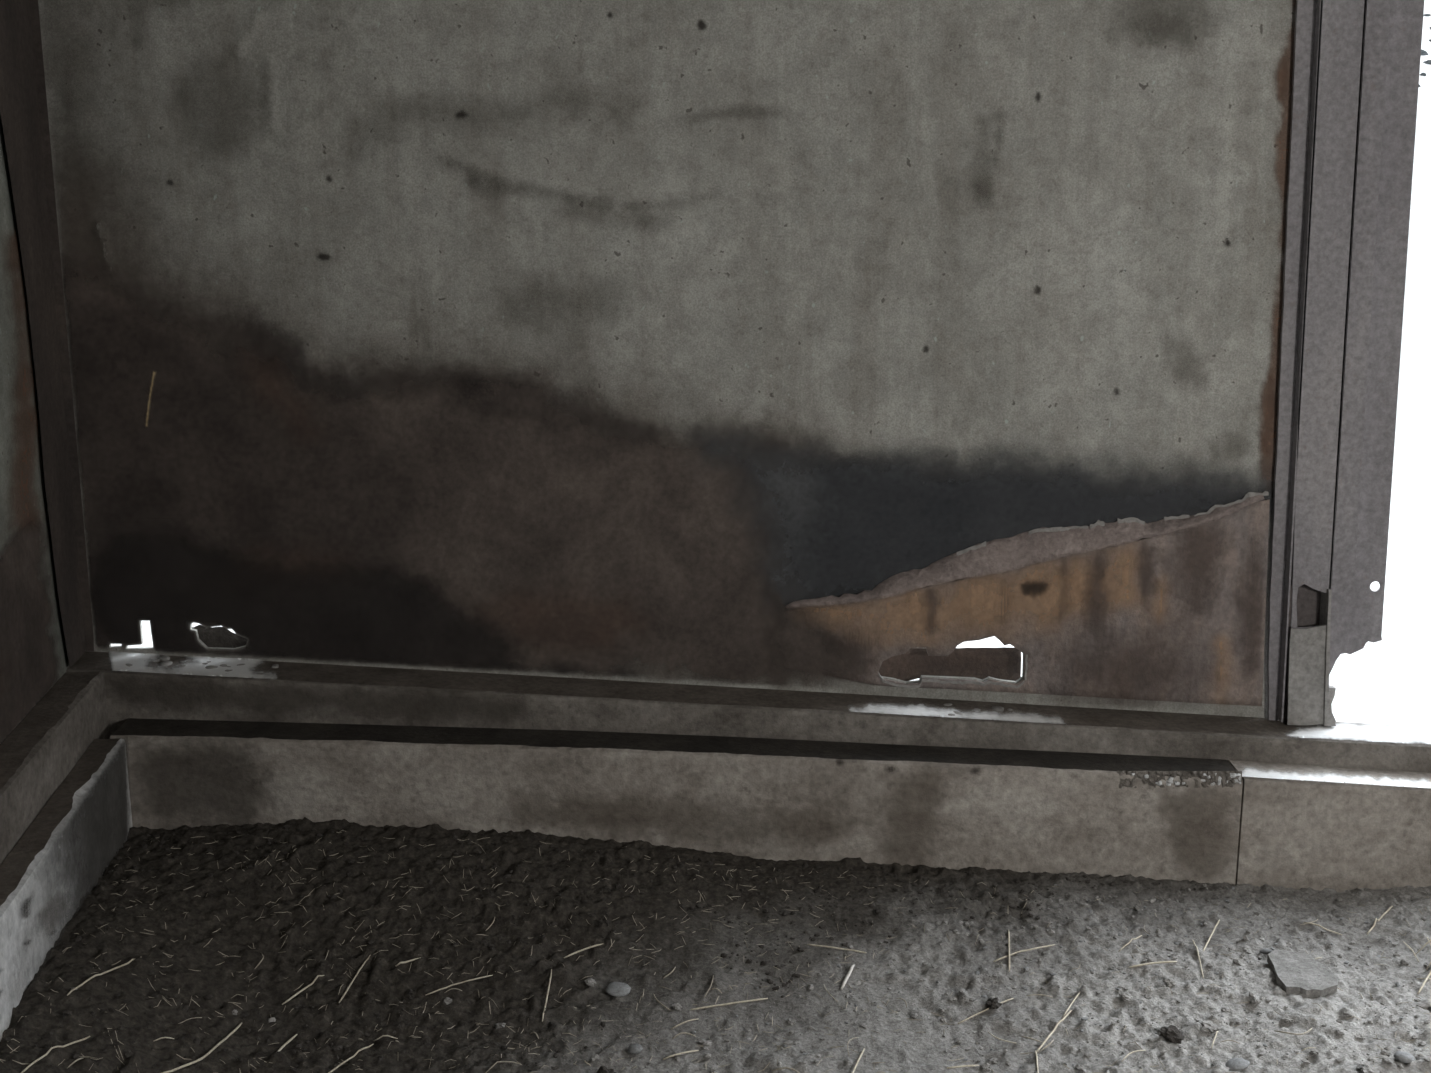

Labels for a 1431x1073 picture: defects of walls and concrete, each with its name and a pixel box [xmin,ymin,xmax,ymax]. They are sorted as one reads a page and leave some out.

leakage [704,436,1274,603]
peeling [768,491,1270,706]
leakage [110,651,518,716]